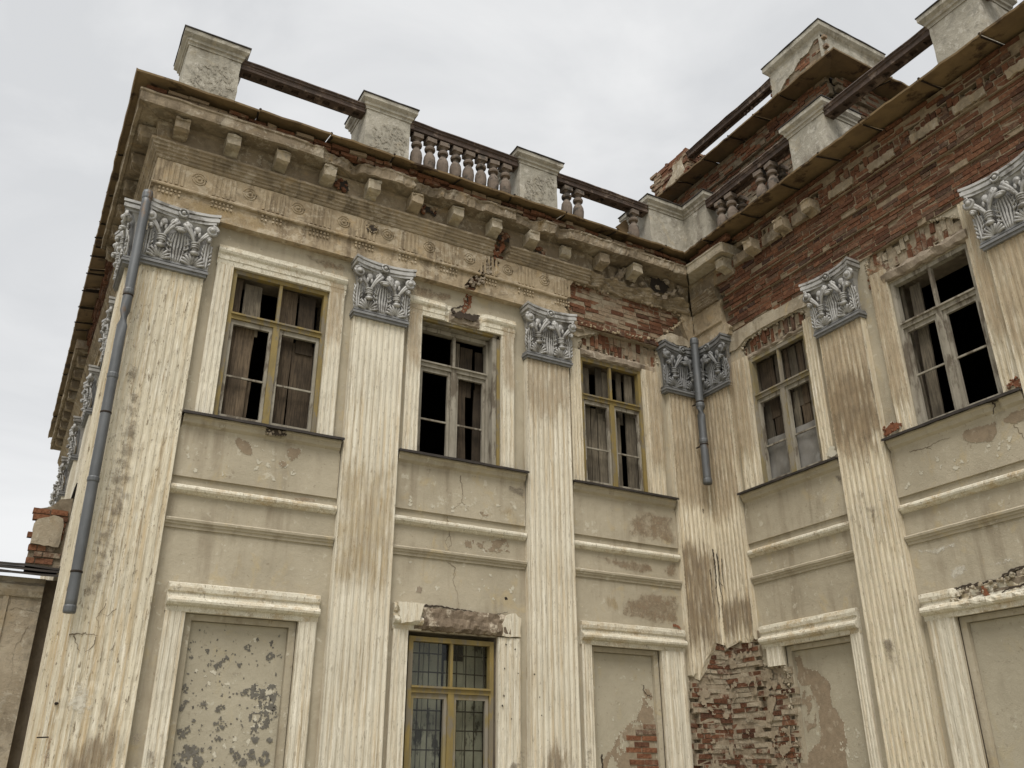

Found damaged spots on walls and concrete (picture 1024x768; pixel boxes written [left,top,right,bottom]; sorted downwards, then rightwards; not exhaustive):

spalling [564,267,691,377]
leakage [827,368,879,447]
peeling [235,429,302,481]
spalling [414,607,511,638]
leakage [626,542,752,647]
crack [710,549,725,617]
flaking render [963,570,1024,597]
peeling [173,629,282,768]
peeling [601,685,659,768]
spalling [688,630,864,768]